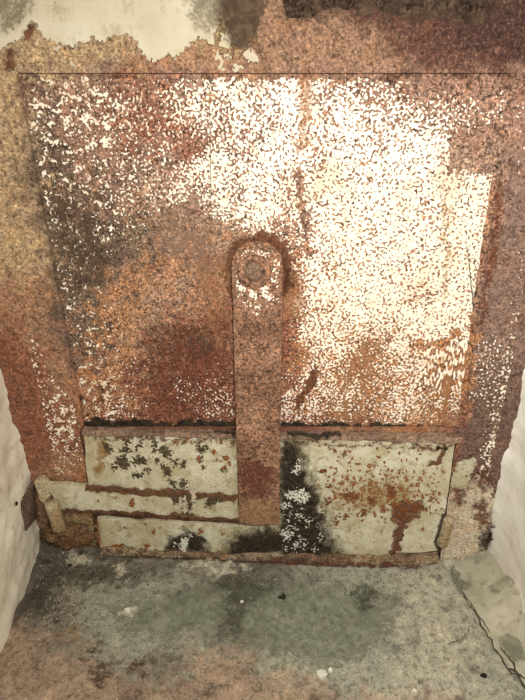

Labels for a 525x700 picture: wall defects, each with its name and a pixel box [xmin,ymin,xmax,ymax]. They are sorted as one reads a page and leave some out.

leakage [0,0,32,33]
leakage [190,0,222,31]
corrosion [222,229,296,301]
peeling [0,0,523,492]
corrosion [478,177,508,343]
corrosion [139,311,236,424]
peeling [101,437,223,515]
corrosion [64,431,280,535]
corrosion [254,439,494,570]
leakage [61,553,142,589]
leakage [113,555,399,668]
crack [448,566,525,689]